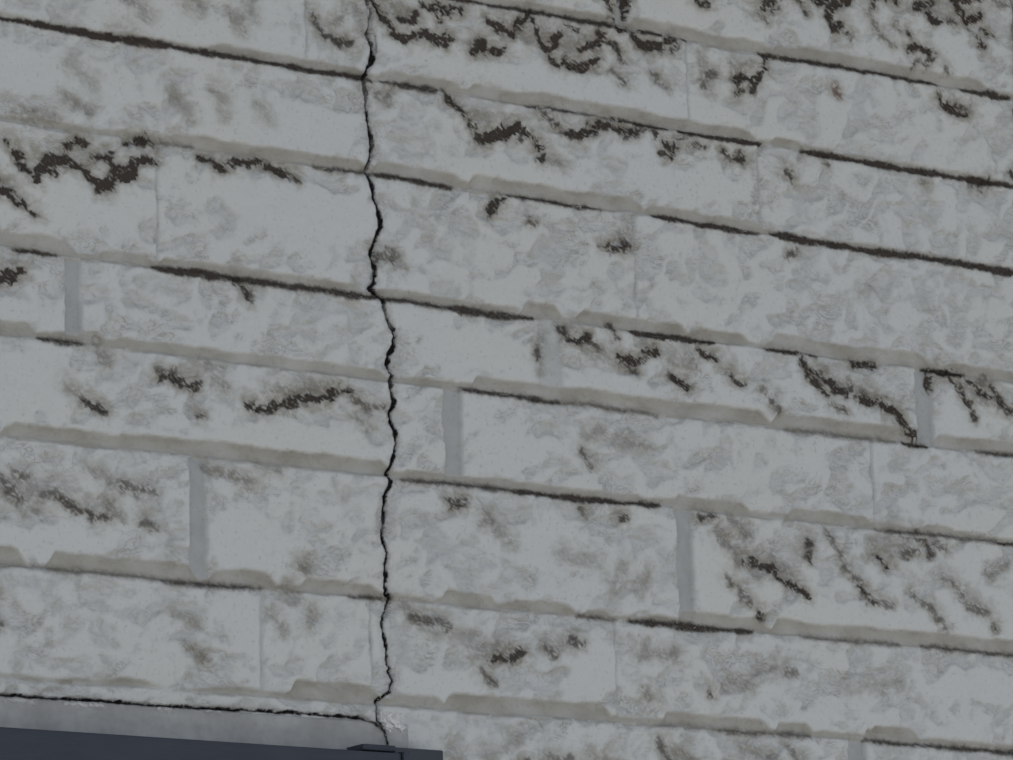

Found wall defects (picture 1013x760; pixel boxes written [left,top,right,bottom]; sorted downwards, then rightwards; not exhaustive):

water stain [396,0,624,74]
water stain [796,0,849,36]
water stain [912,0,994,50]
water stain [959,89,1010,100]
water stain [3,132,158,194]
water stain [314,166,452,191]
water stain [604,117,762,161]
water stain [0,267,26,286]
crack [0,0,398,745]
water stain [555,325,599,352]
water stain [605,323,720,375]
water stain [764,348,895,414]